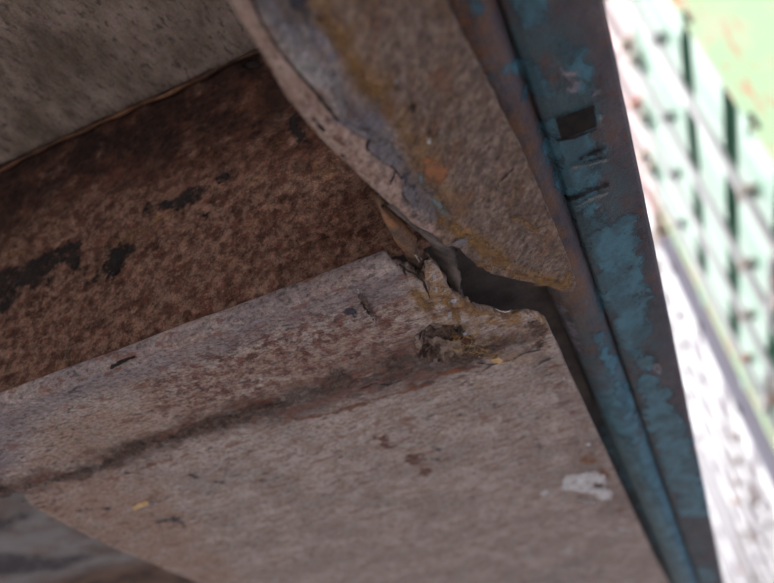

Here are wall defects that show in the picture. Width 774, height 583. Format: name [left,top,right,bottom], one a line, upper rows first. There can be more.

damp [0,233,135,314]
crack [399,263,430,298]
corrosion [374,195,501,352]
spalling [414,324,475,362]
corrosion [525,320,548,348]